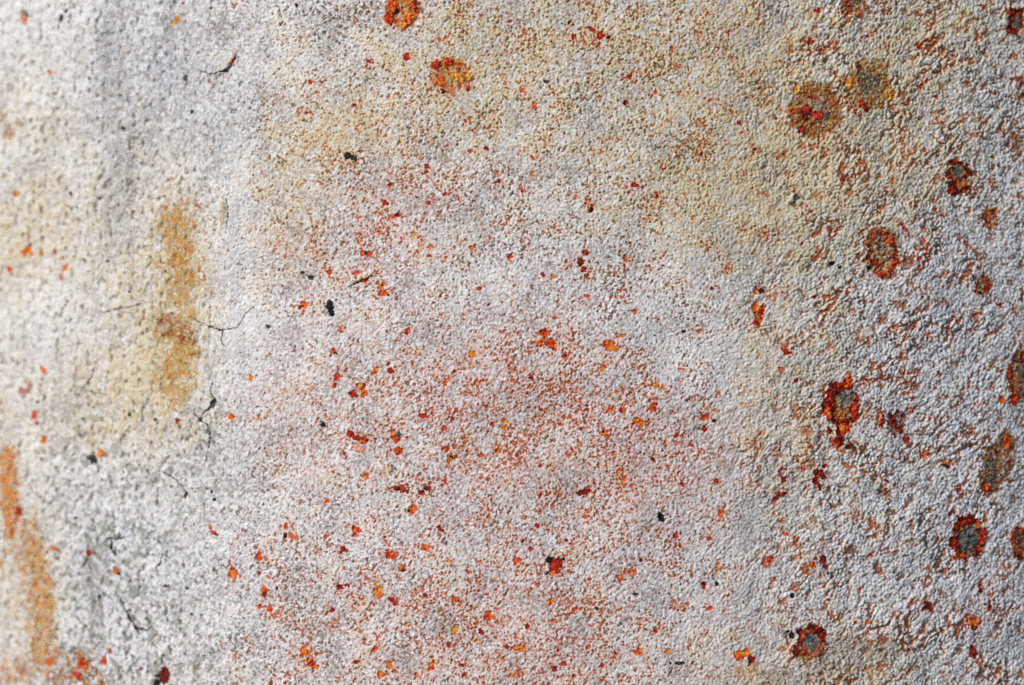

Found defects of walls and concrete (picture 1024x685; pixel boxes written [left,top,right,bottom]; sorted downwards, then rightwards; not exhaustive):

rust [384,0,422,31]
rust [774,56,895,140]
rust [945,158,973,197]
rust [863,223,909,279]
rust [151,198,206,424]
rust [534,306,567,358]
rust [997,349,1024,405]
rust [820,374,868,449]
rust [387,482,431,514]
rust [949,509,989,562]
rust [0,443,112,685]
rust [792,599,830,661]